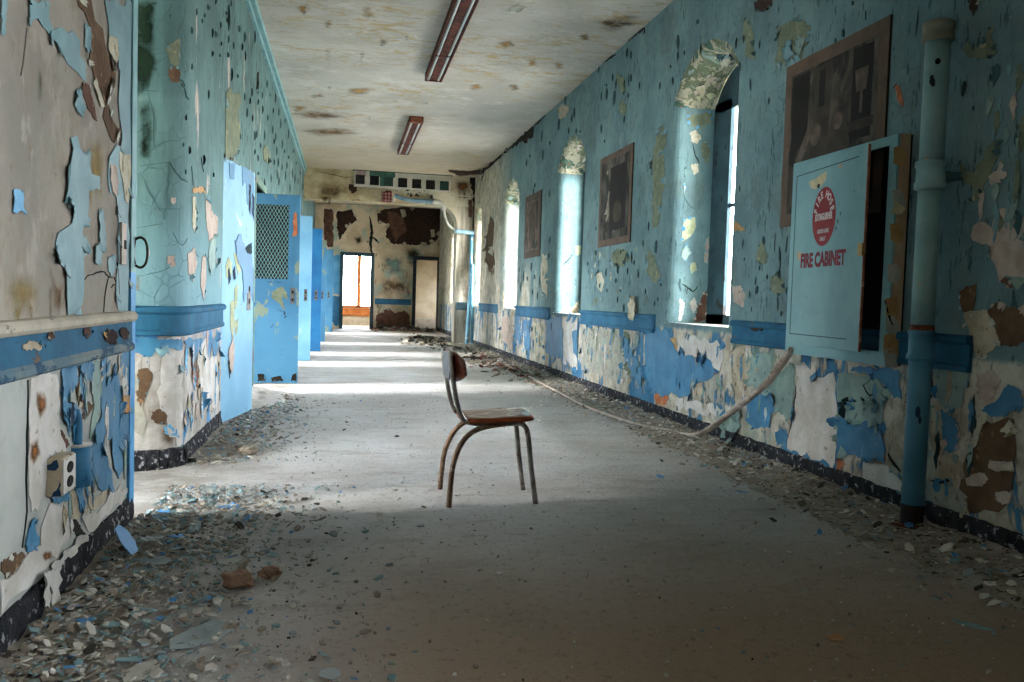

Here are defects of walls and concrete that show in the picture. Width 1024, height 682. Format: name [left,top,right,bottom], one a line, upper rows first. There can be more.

spalling [0,0,254,615]
crack [137,88,204,246]
peeling [323,194,357,326]
spalling [376,188,449,247]
peeling [558,96,586,172]
peeling [659,0,772,193]
peeling [497,123,1024,518]
spalling [957,26,1024,291]